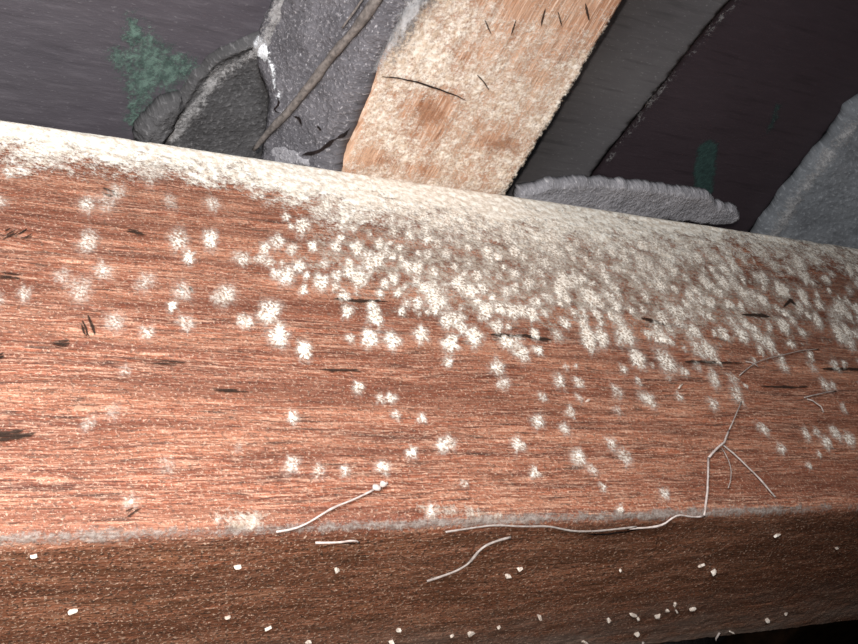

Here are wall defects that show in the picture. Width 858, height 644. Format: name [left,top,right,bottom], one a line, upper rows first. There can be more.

damp [0,0,858,386]
damp [803,427,854,457]
damp [0,503,832,545]